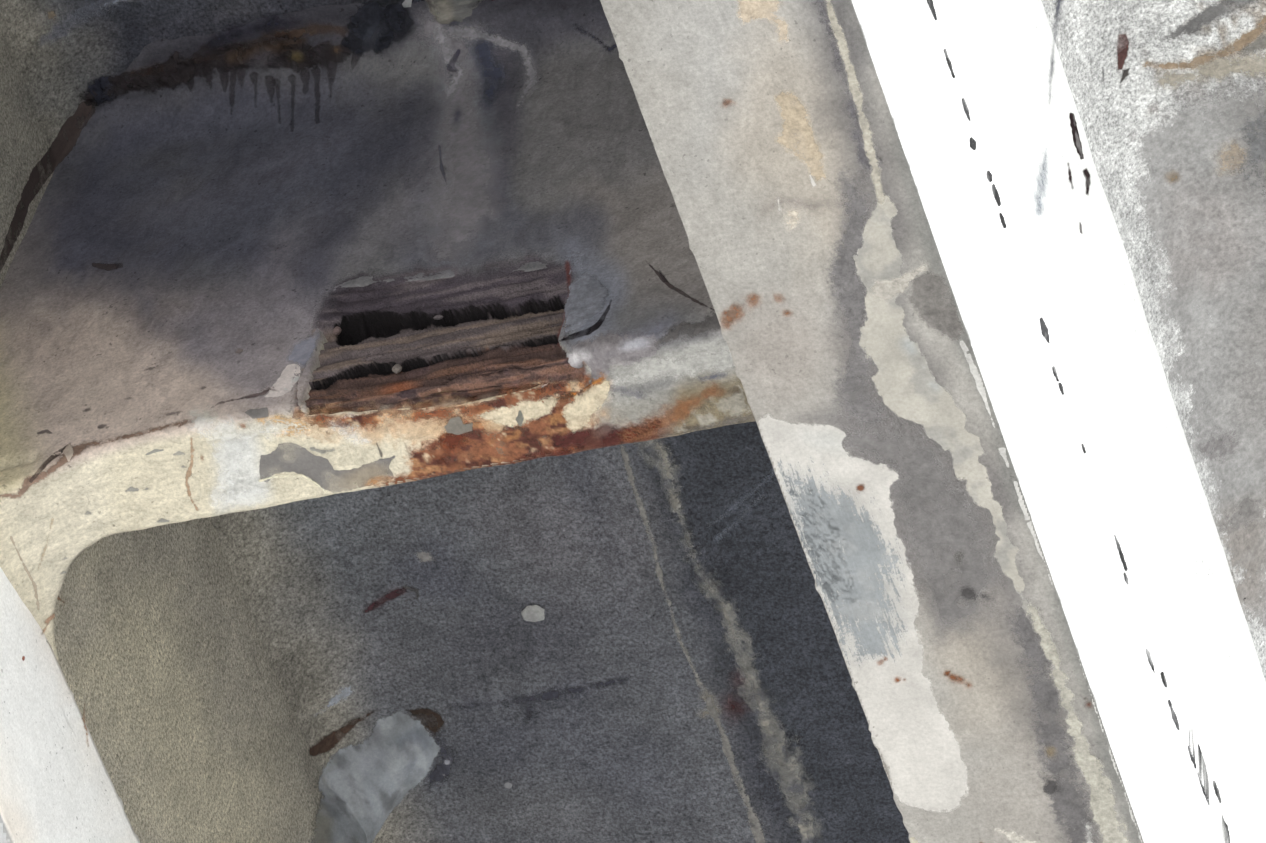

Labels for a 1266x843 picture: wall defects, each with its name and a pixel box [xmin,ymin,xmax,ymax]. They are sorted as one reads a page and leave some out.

water stain [0,0,541,271]
crack [92,263,123,271]
spalling [245,247,609,435]
peeling [259,443,395,492]
rust [242,374,751,486]